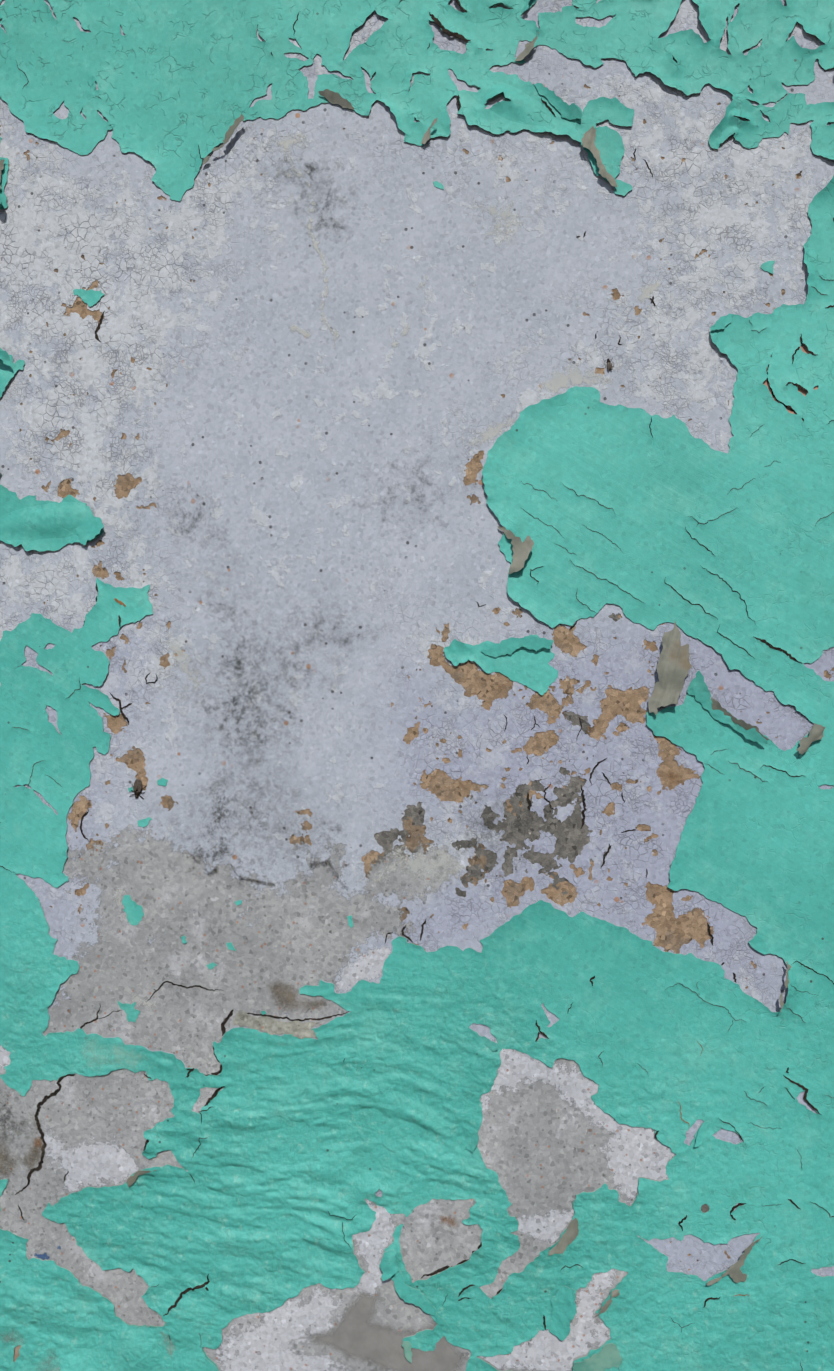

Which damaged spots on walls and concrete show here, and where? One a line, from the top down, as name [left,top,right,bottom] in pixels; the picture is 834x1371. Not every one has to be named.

crack [749,321,834,437]
peeling [0,0,834,1076]
crack [521,461,801,663]
peeling [0,1051,188,1351]
peeling [192,1087,224,1113]
peeling [203,1189,628,1371]
peeling [466,1003,762,1298]
peeling [797,1091,818,1114]